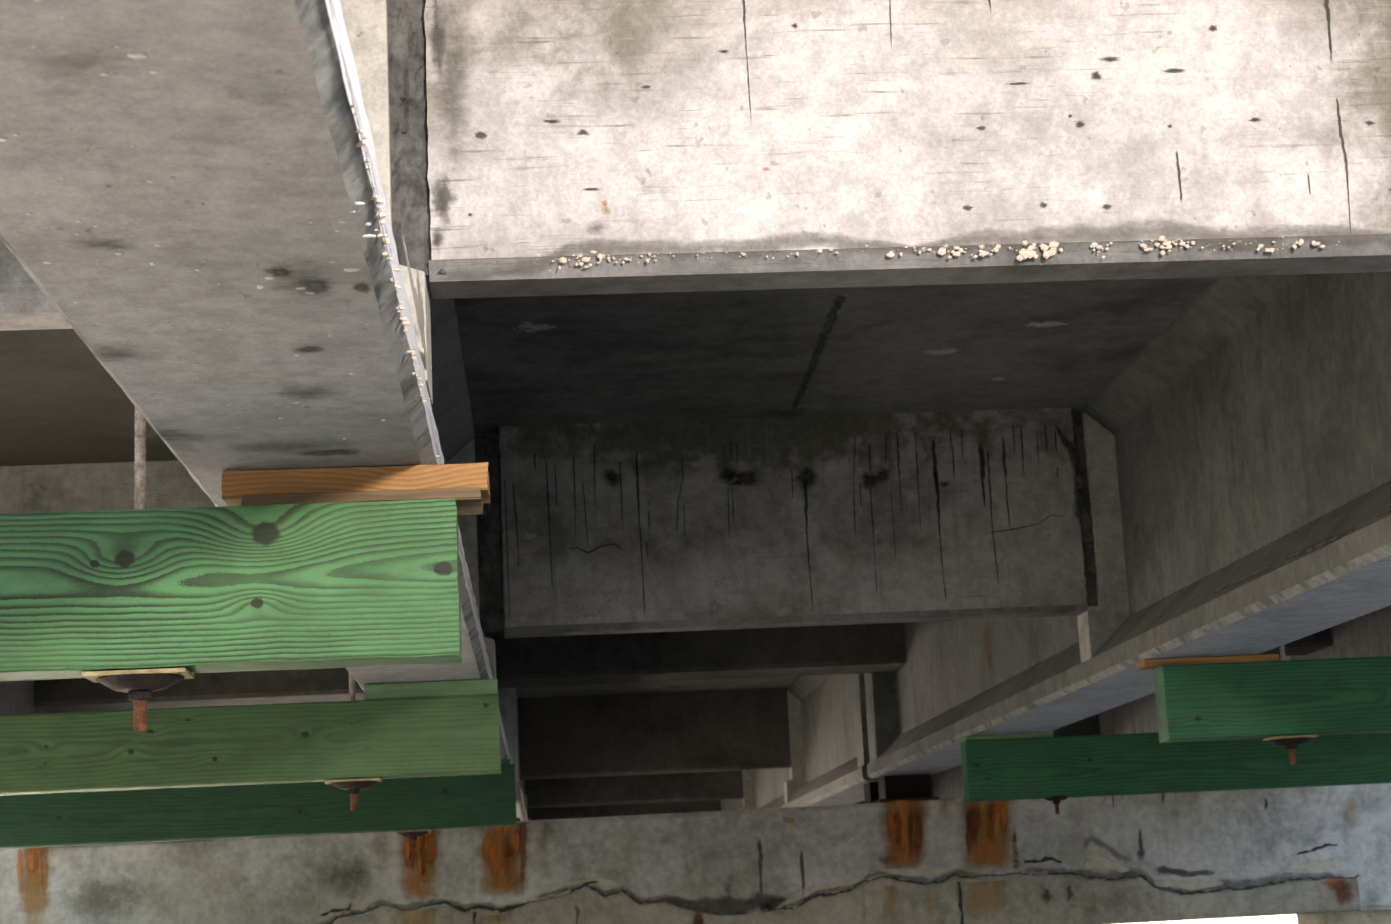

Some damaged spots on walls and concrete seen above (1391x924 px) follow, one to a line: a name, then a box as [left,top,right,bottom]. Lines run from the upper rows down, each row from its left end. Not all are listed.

water stain [742,0,751,112]
crack [1324,0,1332,58]
crack [1336,99,1351,231]
water stain [721,439,755,537]
water stain [791,467,815,609]
water stain [853,424,1097,598]
corrosion [17,847,48,924]
corrosion [405,831,436,898]
corrosion [483,822,526,891]
crack [319,843,1361,924]
corrosion [879,800,922,866]
corrosion [966,800,1019,868]